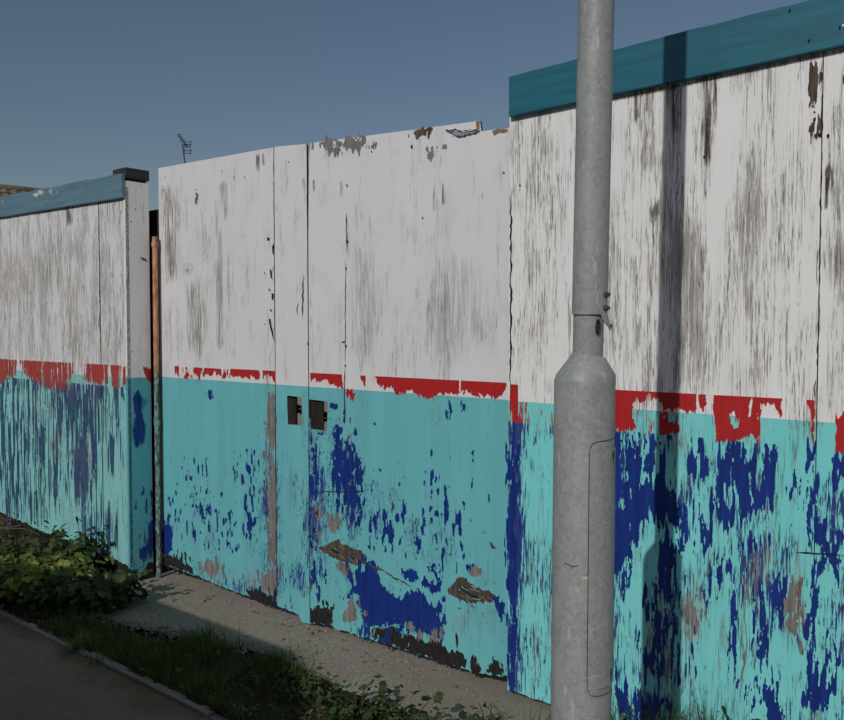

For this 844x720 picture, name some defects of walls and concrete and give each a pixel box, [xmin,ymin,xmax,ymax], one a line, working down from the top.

peeling [311,134,377,157]
peeling [408,127,447,161]
water stain [701,74,716,161]
peeling [808,60,823,145]
water stain [825,164,833,207]
peeling [174,366,276,383]
peeling [310,373,355,401]
peeling [0,359,146,556]
peeling [135,392,292,612]
peeling [309,402,482,648]
peeling [360,375,521,697]
peeling [611,390,844,720]